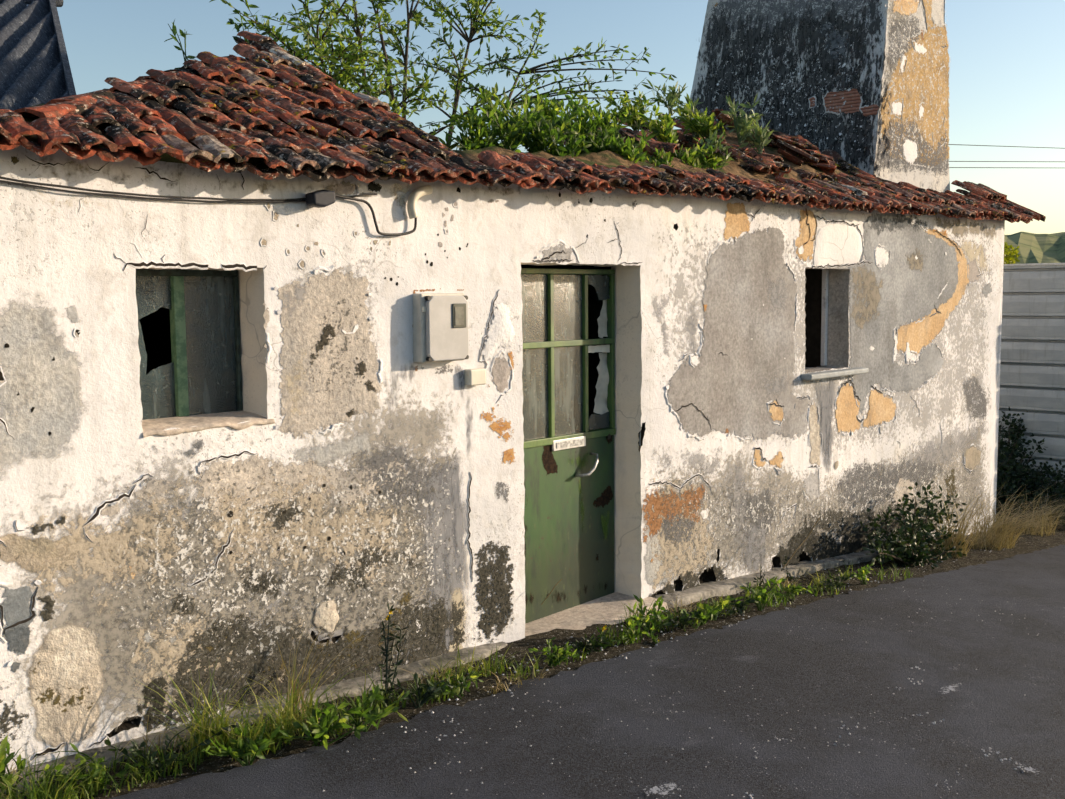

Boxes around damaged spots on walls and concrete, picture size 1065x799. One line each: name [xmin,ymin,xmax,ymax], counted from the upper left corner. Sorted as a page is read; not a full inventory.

leakage [692,0,949,176]
crack [83,473,153,543]
leakage [0,260,517,765]
flaking render [198,242,408,560]
crack [479,290,499,369]
rust [481,407,515,464]
rust [642,484,707,542]
crack [641,473,714,492]
crack [674,403,712,430]
flaking render [664,199,823,503]
flaking render [834,212,992,437]
flaking render [0,533,142,748]